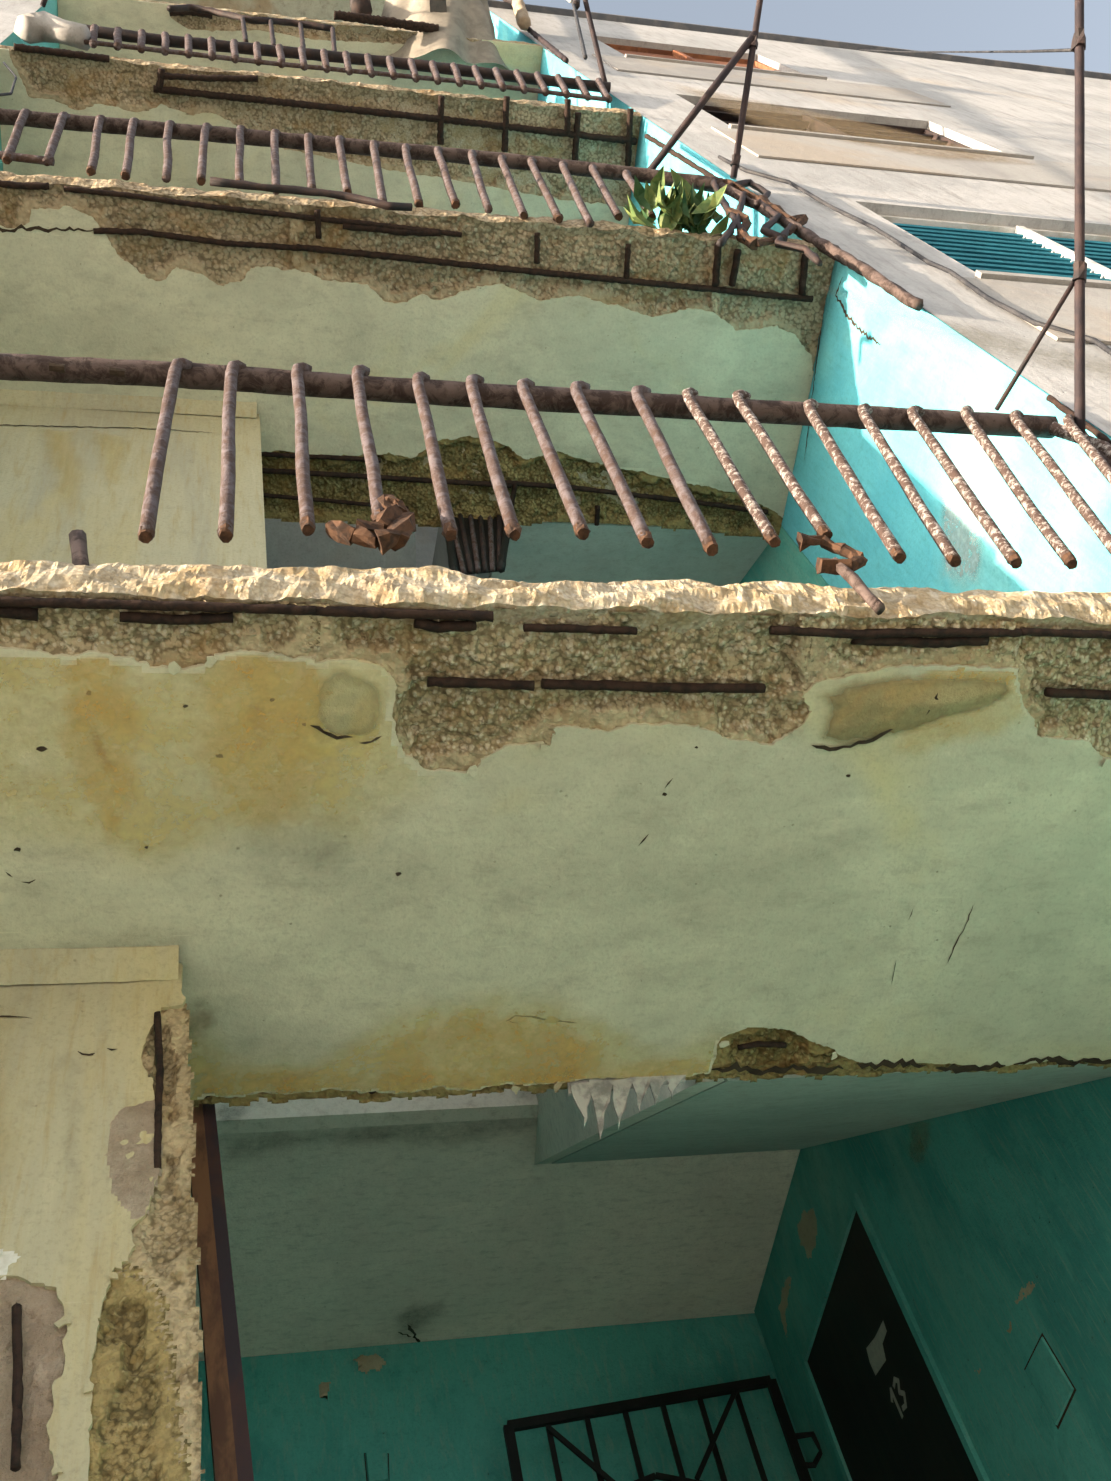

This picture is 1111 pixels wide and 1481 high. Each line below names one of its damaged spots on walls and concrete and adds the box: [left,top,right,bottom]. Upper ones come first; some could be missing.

spalling [9,43,717,208]
crack [0,224,93,233]
spalling [0,180,864,371]
leakage [213,663,376,805]
spalling [0,595,1111,778]
spalling [84,1003,1111,1481]
spalling [0,1249,71,1481]